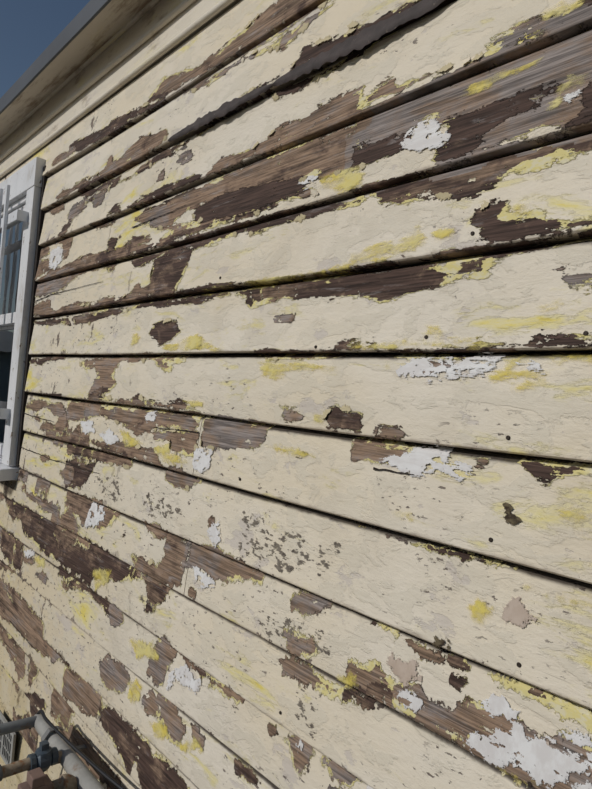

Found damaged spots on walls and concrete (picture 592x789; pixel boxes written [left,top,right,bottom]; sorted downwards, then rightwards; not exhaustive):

peeling [33,0,592,326]
peeling [249,329,592,376]
peeling [474,457,491,470]
peeling [517,458,592,487]
peeling [0,317,343,789]
peeling [355,521,519,571]
peeling [258,588,592,789]